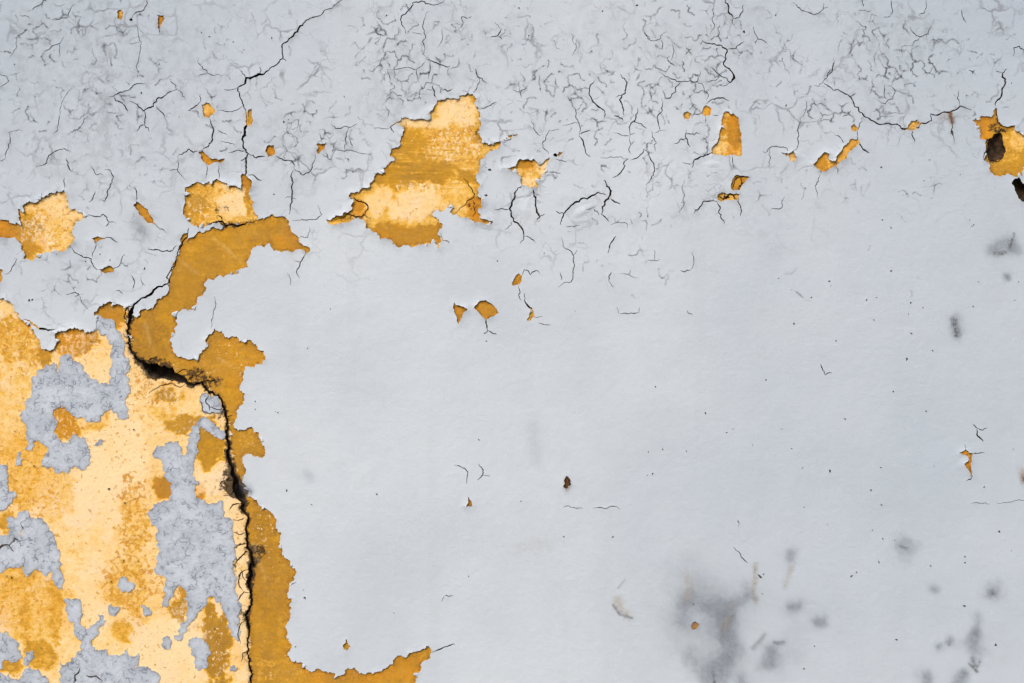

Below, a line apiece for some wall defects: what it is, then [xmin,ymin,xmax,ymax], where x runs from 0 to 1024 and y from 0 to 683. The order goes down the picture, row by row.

crack [0,0,79,86]
crack [110,0,369,279]
peeling [327,90,518,248]
peeling [502,152,562,188]
crack [361,0,971,325]
peeling [683,105,742,158]
peeling [814,124,860,174]
crack [969,46,1022,162]
peeling [973,105,1024,202]
peeling [453,300,499,324]
crack [2,89,258,683]
peeling [0,173,435,683]